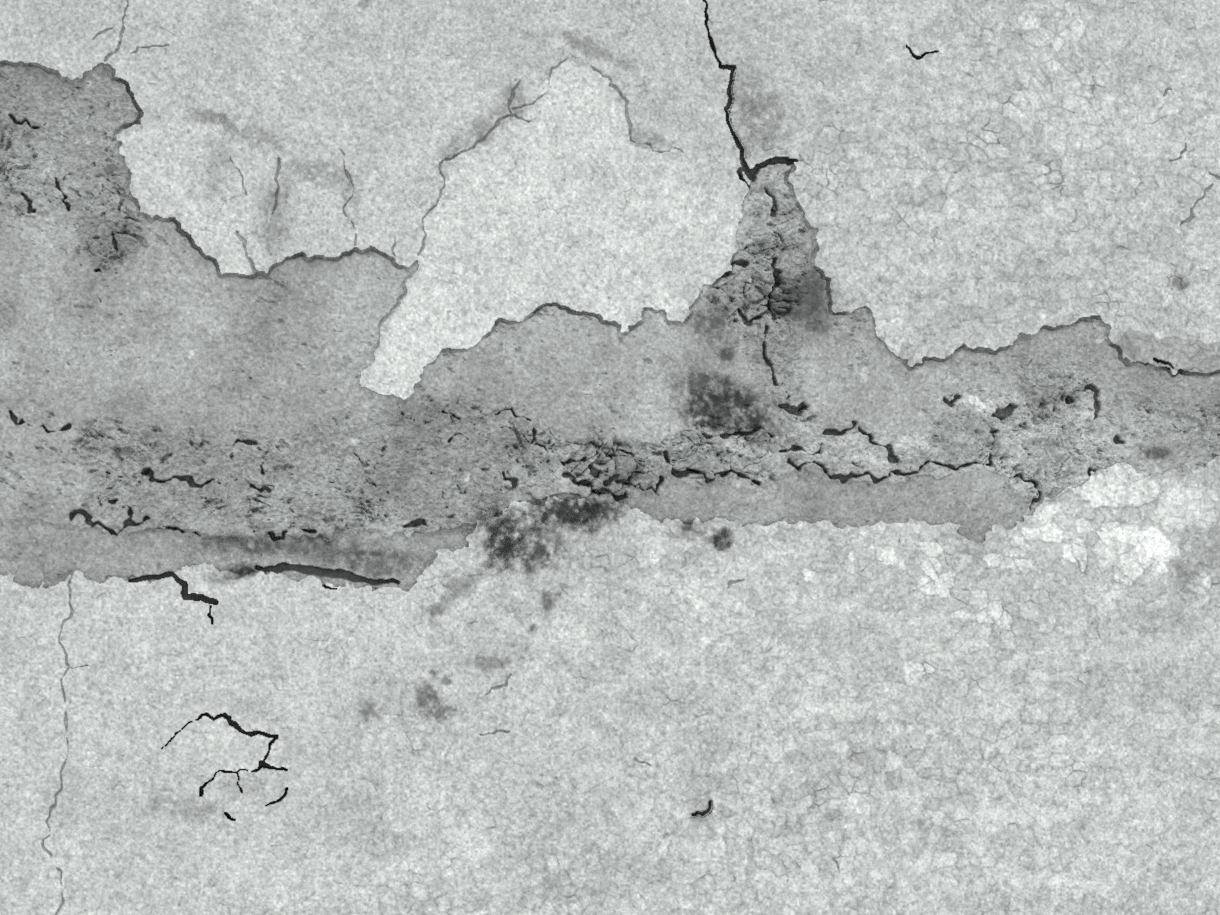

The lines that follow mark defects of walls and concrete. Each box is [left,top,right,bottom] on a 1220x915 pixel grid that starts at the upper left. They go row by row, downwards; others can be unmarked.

crack [702,0,798,187]
peeling [0,54,1220,605]
crack [127,571,219,625]
crack [254,562,400,590]
peeling [687,596,708,613]
peeling [972,598,1003,626]
crack [41,570,89,915]
crack [161,712,288,821]
crack [691,800,713,818]